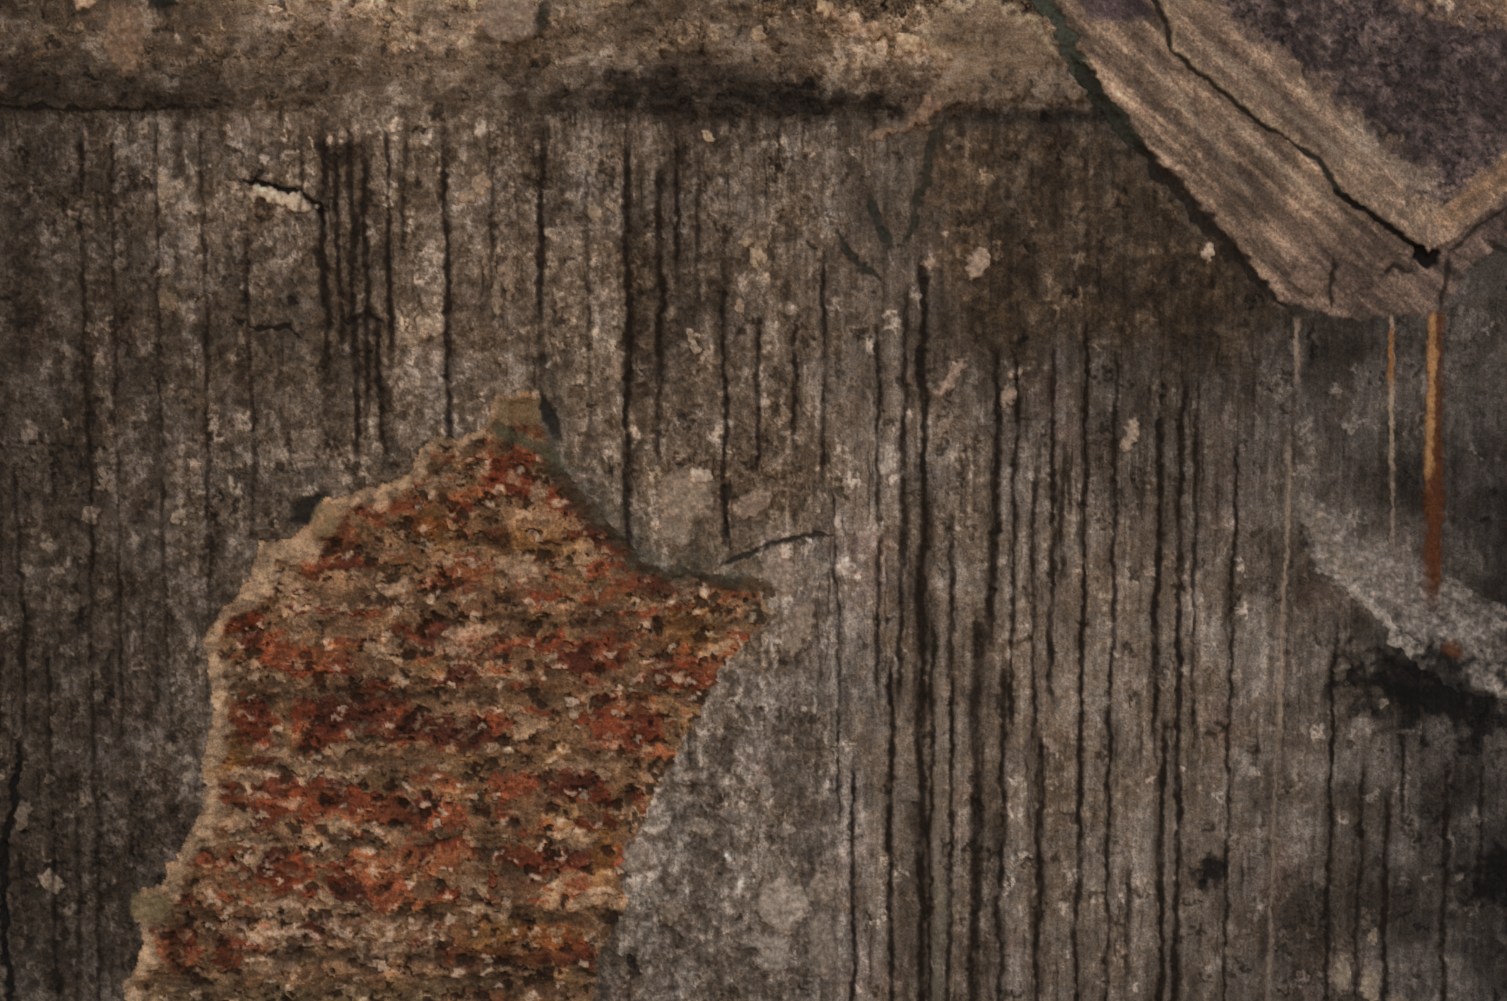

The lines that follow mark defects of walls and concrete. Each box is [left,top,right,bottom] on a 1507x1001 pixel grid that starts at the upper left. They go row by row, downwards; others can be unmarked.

flaking render [245,180,325,222]
flaking render [965,247,991,278]
flaking render [1053,0,1507,323]
crack [1152,0,1507,306]
rust [1387,316,1395,545]
rust [1425,313,1444,588]
spalling [122,390,816,1001]
crack [0,742,22,1001]